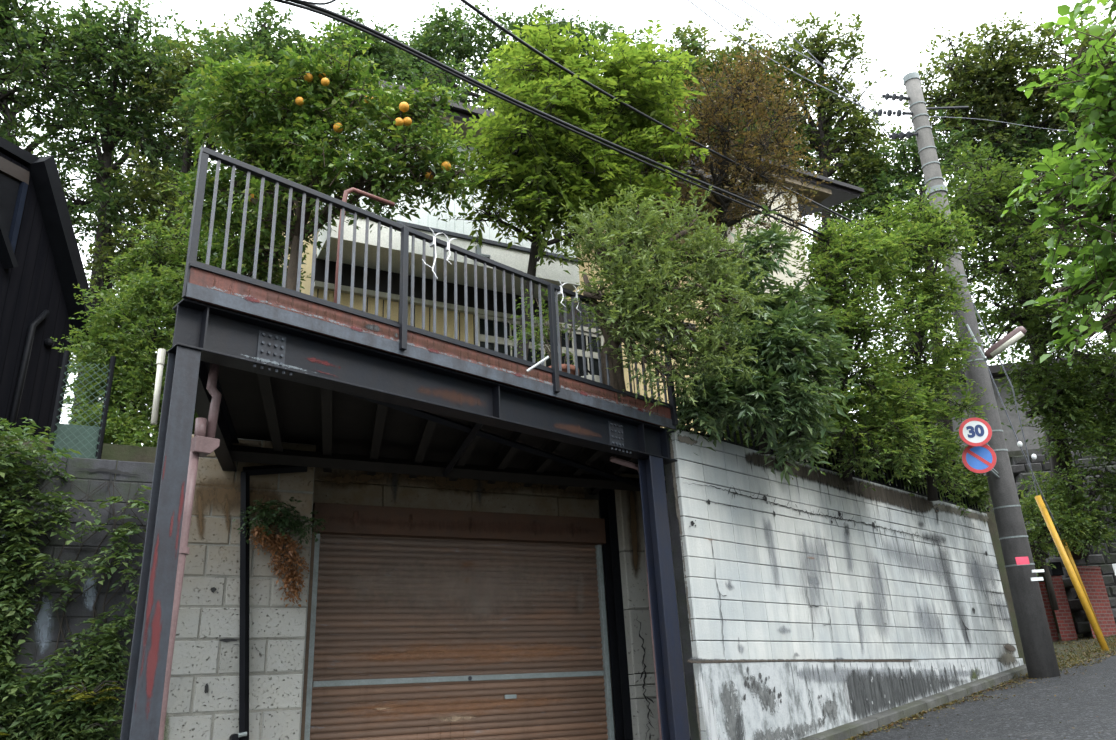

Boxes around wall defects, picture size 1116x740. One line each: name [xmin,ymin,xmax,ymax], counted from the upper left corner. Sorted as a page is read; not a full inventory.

damp [628,491,640,576]
damp [736,452,989,644]
crack [636,616,654,740]
damp [687,601,1020,740]